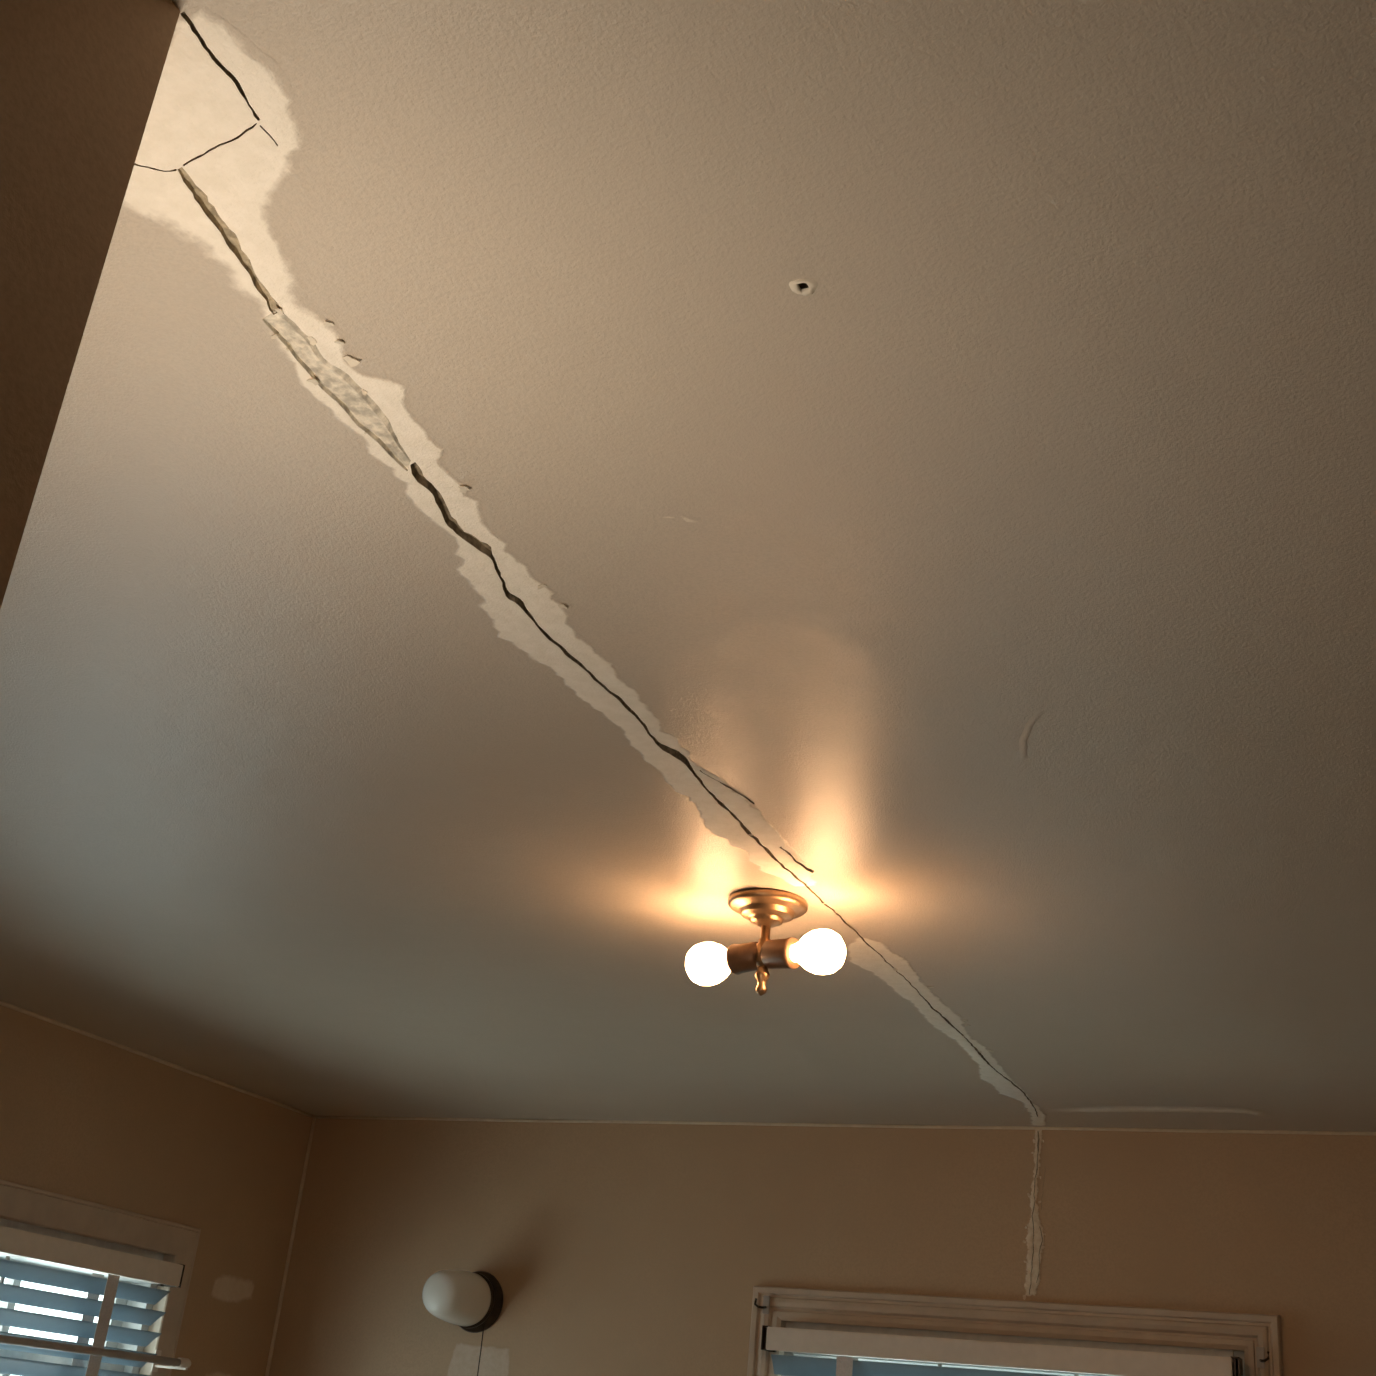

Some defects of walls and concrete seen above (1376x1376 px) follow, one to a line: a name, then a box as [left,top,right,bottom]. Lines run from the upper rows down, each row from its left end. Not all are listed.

peeling [117,6,819,887]
crack [134,12,1046,1300]